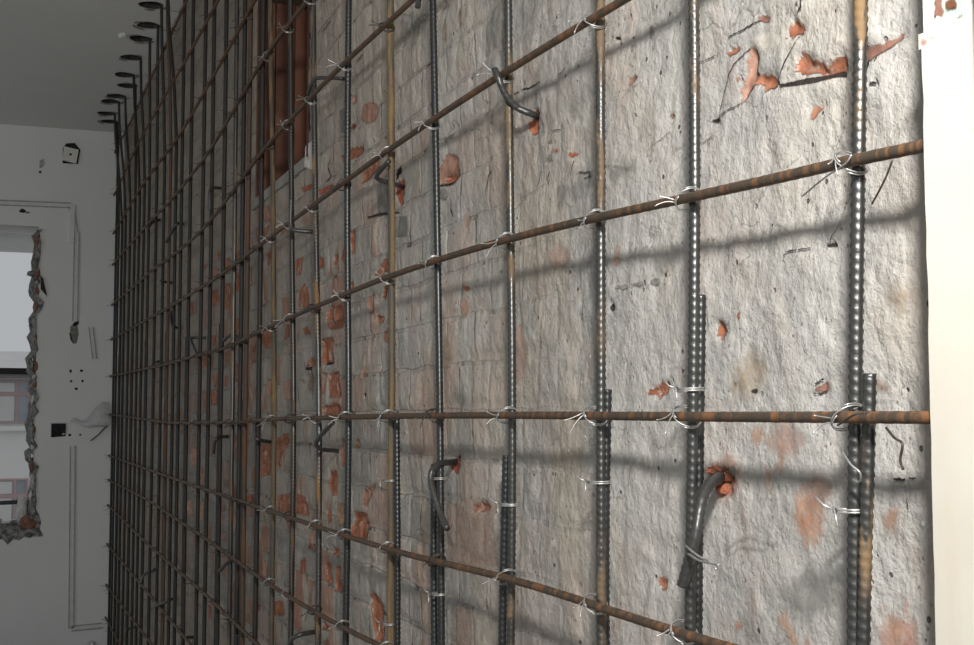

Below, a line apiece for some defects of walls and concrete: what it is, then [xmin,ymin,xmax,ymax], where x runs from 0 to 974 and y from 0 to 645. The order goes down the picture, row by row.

peeling [934,0,964,23]
spalling [867,34,905,67]
crack [651,1,805,150]
spalling [741,46,848,103]
spalling [871,160,894,205]
crack [783,226,838,256]
spalling [717,318,727,341]
spalling [0,229,47,545]
spalling [648,381,670,399]
spalling [814,378,829,395]
spalling [885,427,904,470]
spalling [705,456,738,500]